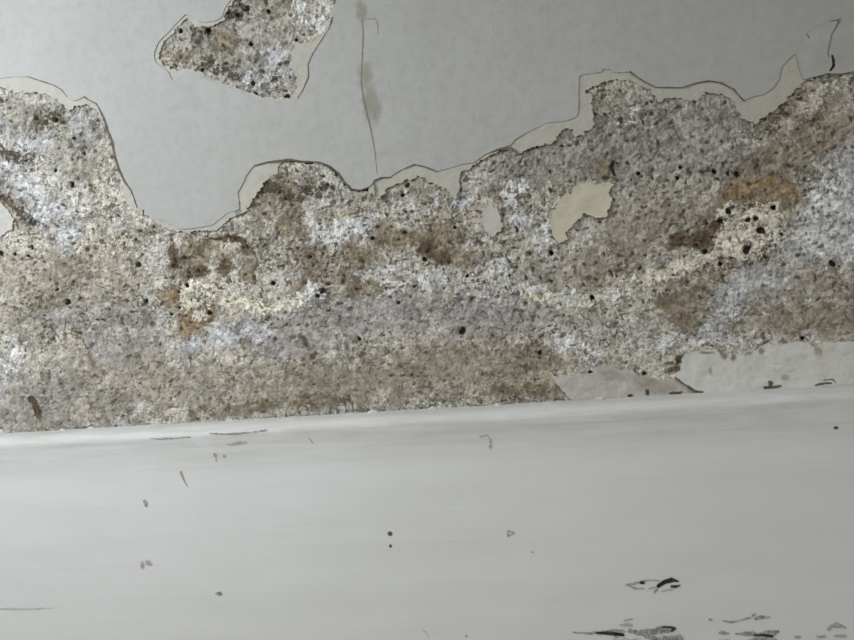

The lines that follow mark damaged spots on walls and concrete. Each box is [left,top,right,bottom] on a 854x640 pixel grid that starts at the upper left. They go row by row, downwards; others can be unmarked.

spalling [155,0,335,101]
crack [254,18,437,197]
spalling [0,53,854,433]